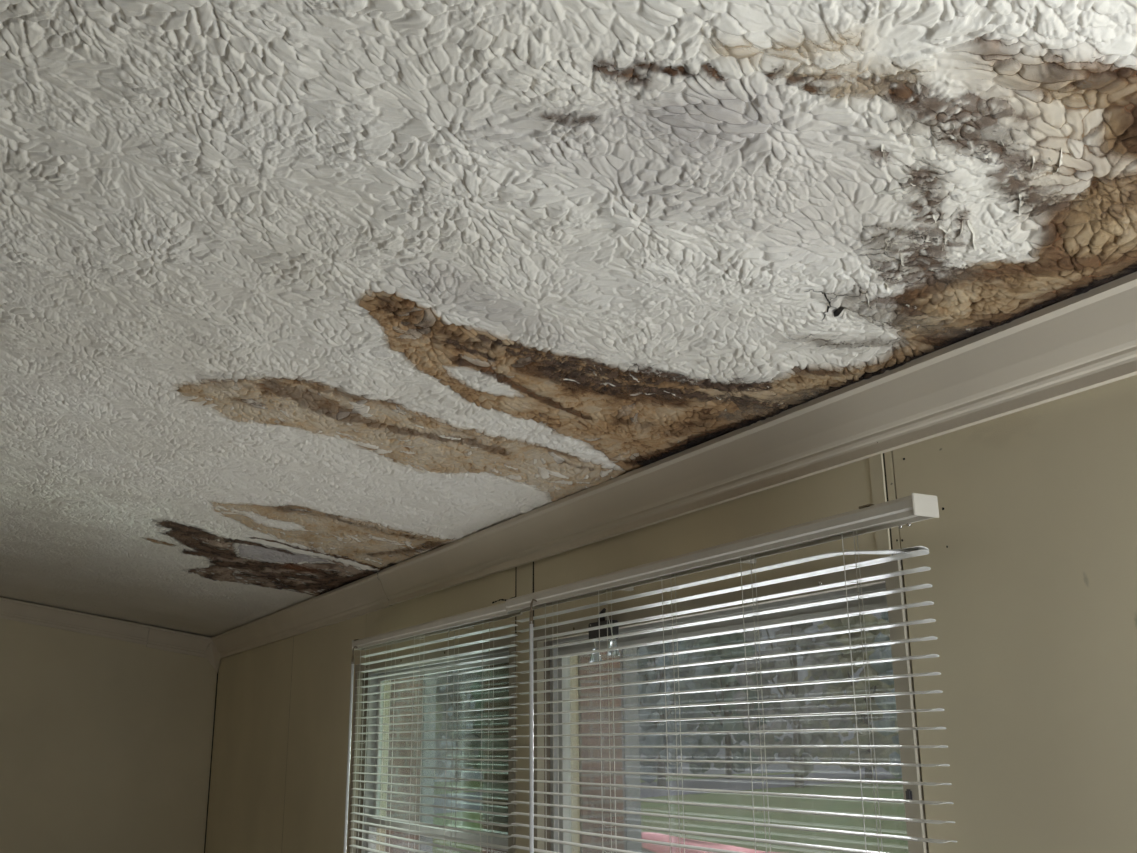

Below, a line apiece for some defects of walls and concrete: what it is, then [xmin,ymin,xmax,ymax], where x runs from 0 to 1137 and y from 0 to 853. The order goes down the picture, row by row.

leakage [177,38,1137,502]
peeling [869,214,977,295]